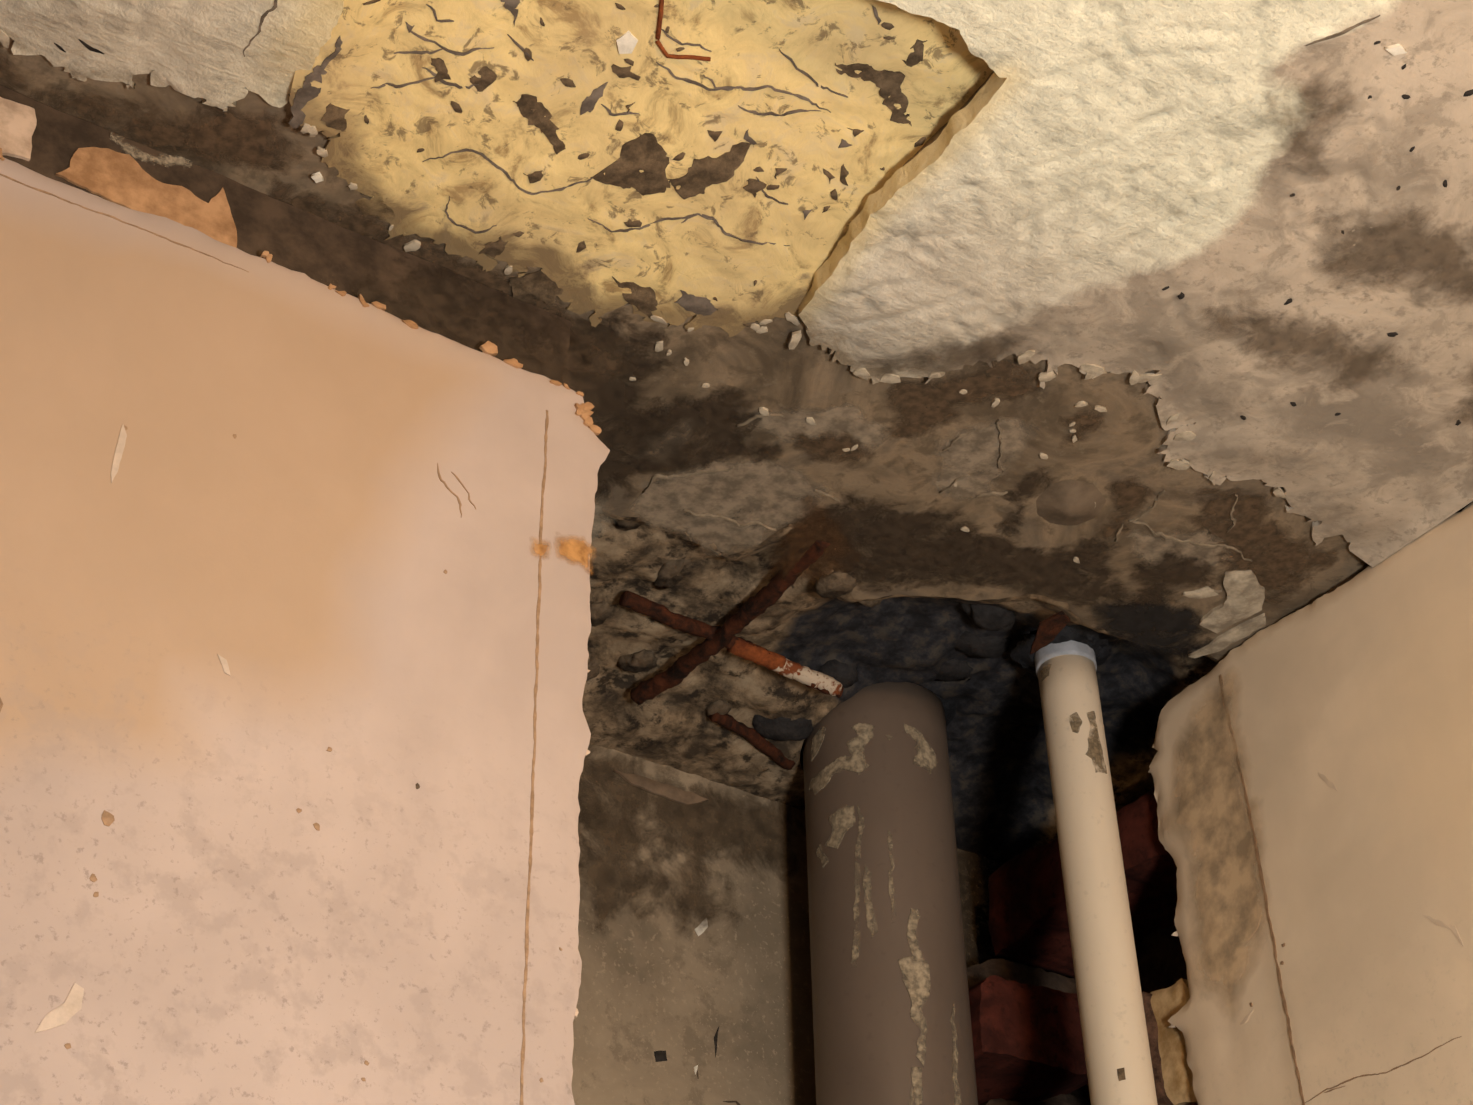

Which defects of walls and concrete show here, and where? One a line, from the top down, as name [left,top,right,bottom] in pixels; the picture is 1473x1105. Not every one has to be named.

crack [243,0,278,57]
spalling [289,0,993,349]
leakage [1325,214,1473,296]
peeling [479,341,523,369]
peeling [549,380,602,435]
peeling [853,368,901,384]
peeling [1017,350,1056,382]
leakage [1216,316,1389,380]
spalling [582,508,1266,865]
leakage [578,745,796,930]
leakage [1177,687,1260,994]
crack [1219,674,1462,1105]